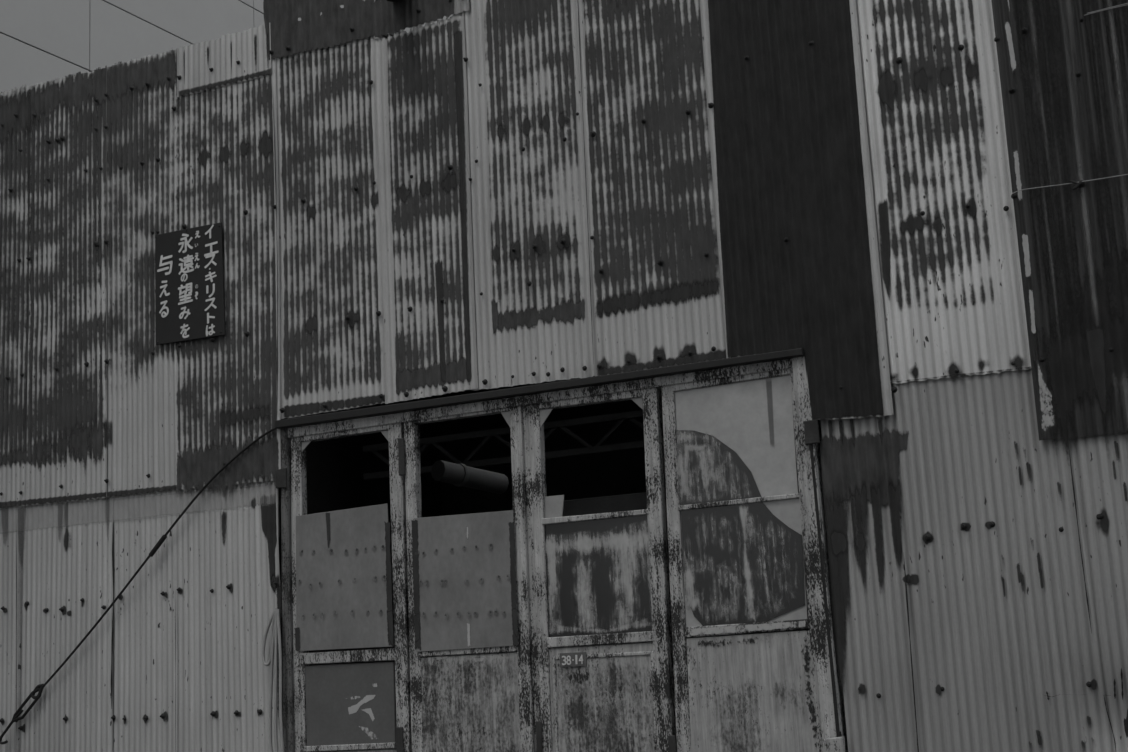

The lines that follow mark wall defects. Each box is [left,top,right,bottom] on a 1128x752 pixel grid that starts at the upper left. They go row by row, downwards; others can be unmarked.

corrosion [0,0,472,722]
corrosion [411,520,518,650]
corrosion [484,0,1031,695]
corrosion [1014,0,1128,455]
corrosion [1096,509,1109,534]